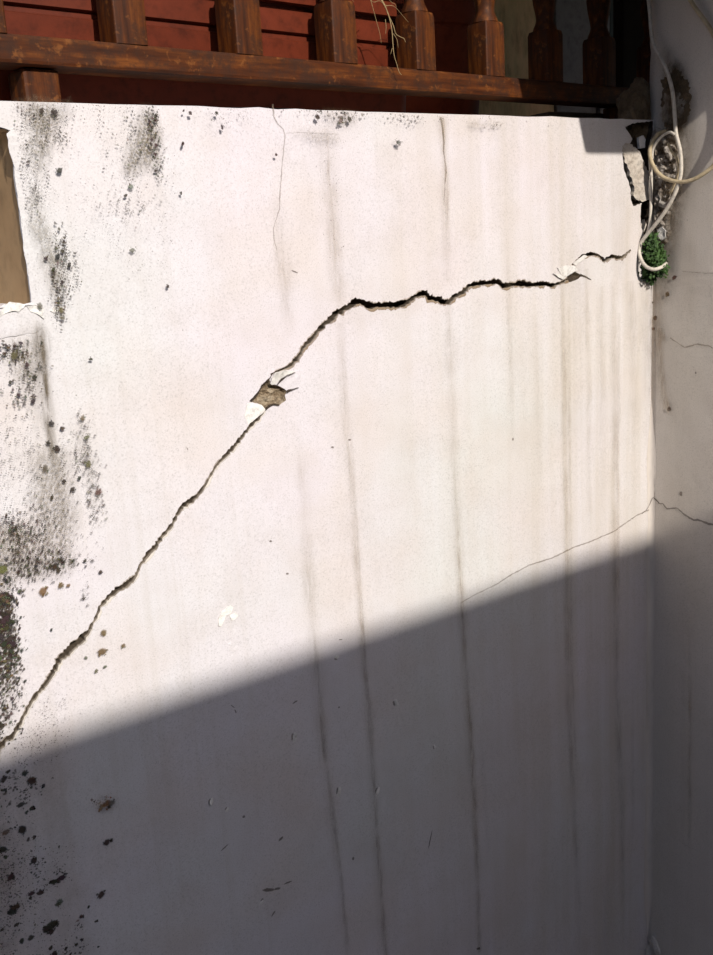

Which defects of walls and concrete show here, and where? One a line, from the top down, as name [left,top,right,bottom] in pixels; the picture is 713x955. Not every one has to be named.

mould [12,103,175,331]
spalling [244,370,301,425]
crack [270,249,631,375]
spalling [622,66,687,262]
leakage [0,340,106,955]
crack [0,411,266,760]
crack [642,495,713,525]